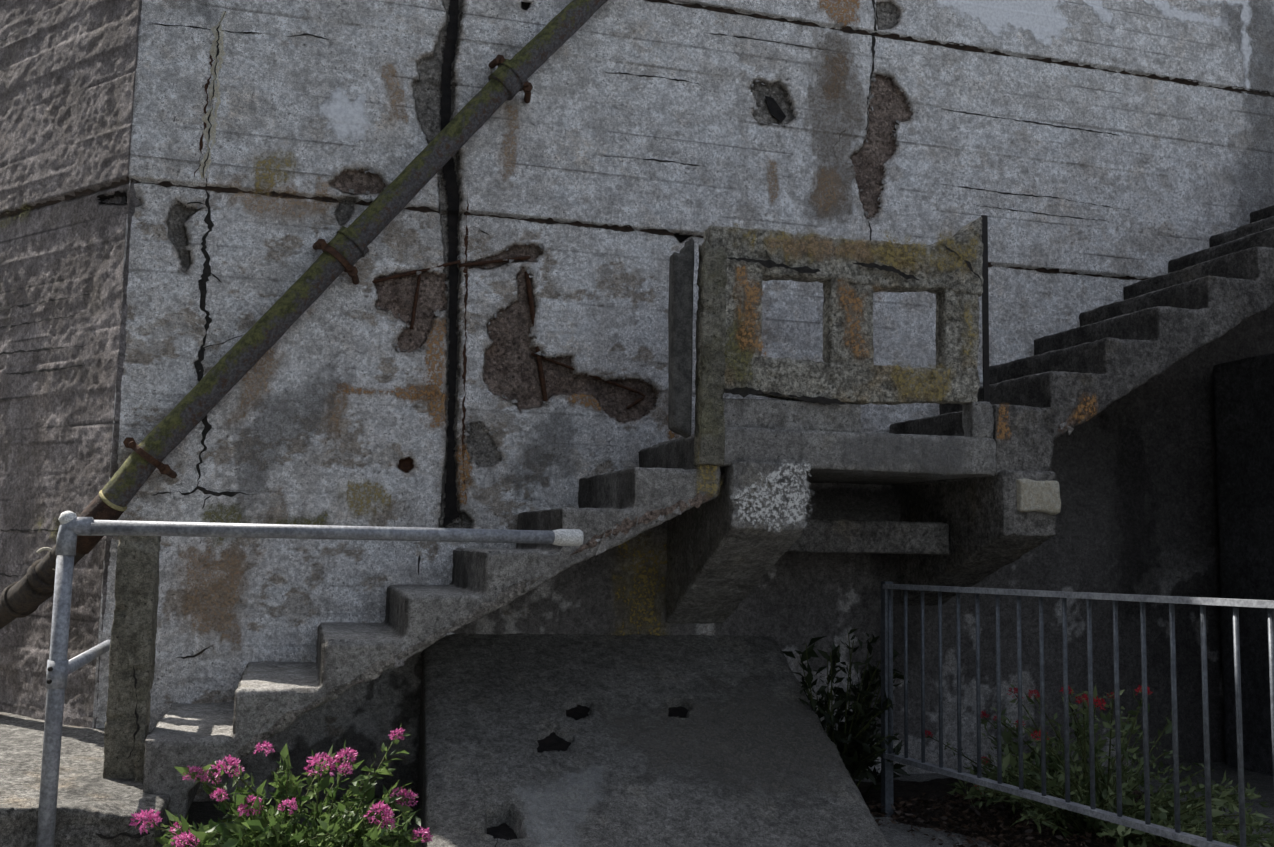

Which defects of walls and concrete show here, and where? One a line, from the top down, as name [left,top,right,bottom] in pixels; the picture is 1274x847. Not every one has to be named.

crack [154,11,332,381]
spalling [330,167,386,226]
crack [412,0,489,528]
spalling [372,243,659,423]
spalling [751,79,796,127]
crack [708,33,840,53]
corrosion [820,0,860,28]
crack [833,0,877,158]
spalling [851,74,913,221]
crack [153,415,255,509]